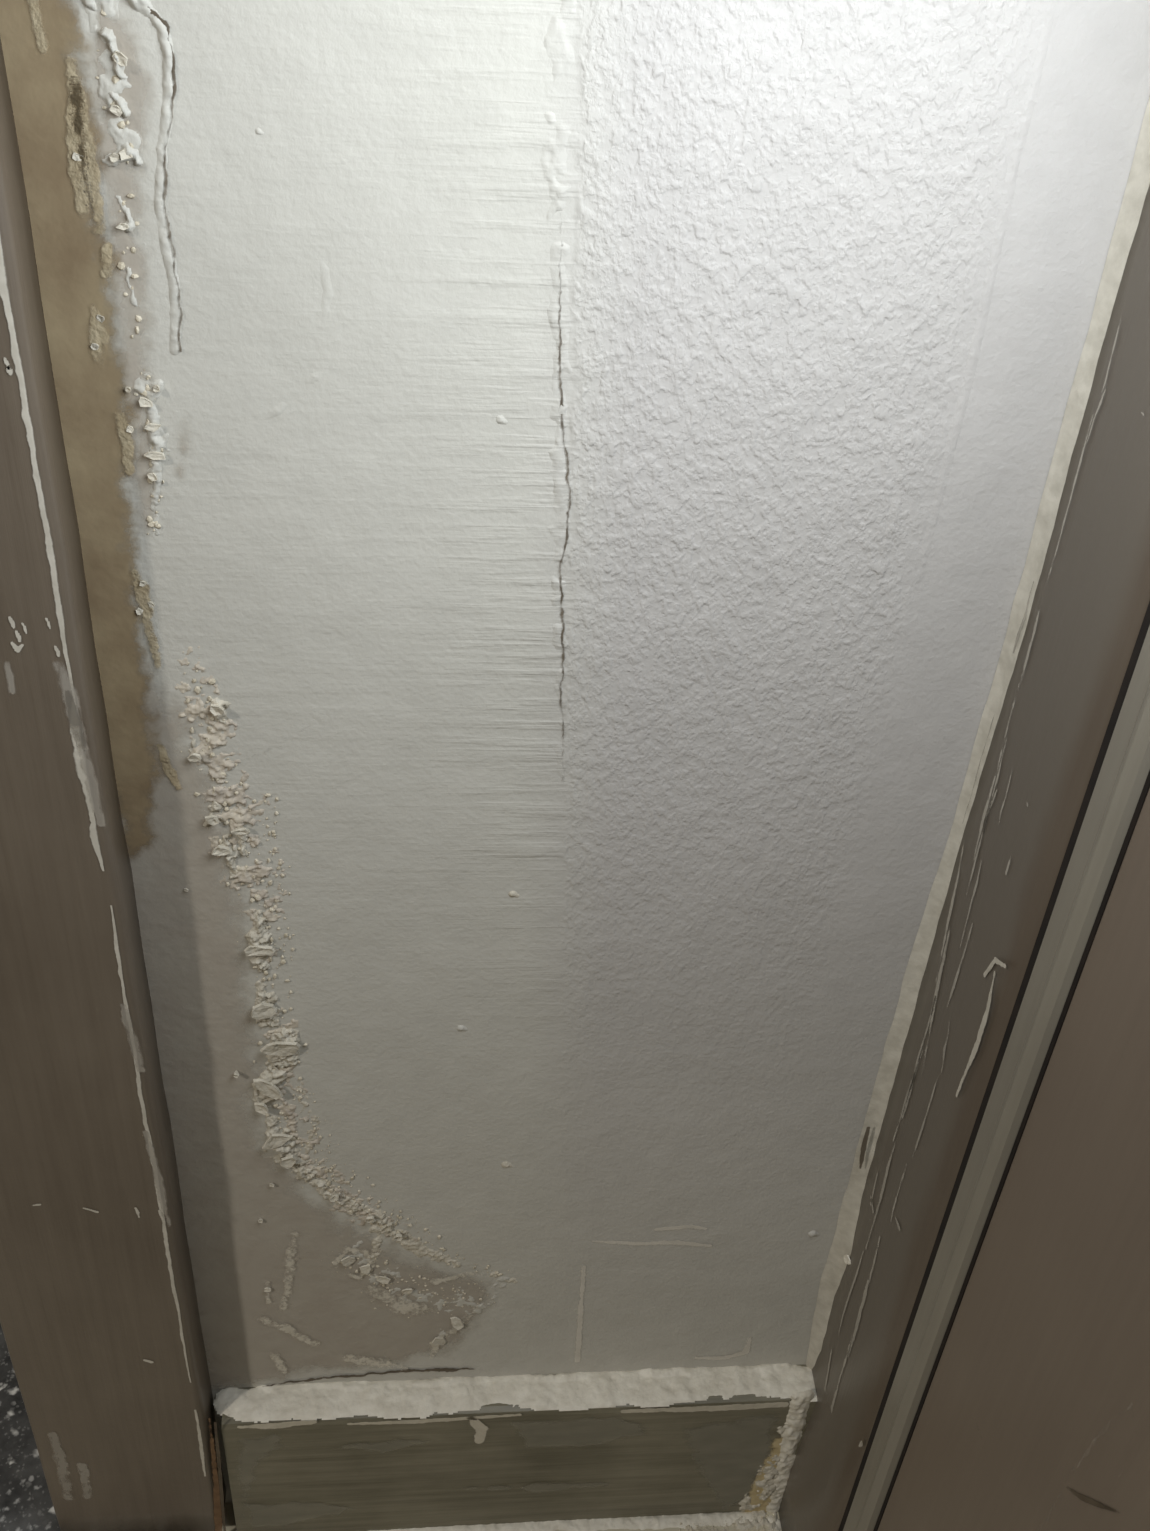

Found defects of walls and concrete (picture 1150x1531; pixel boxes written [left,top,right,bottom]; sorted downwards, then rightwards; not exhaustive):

peeling [0,238,128,871]
peeling [81,0,179,536]
peeling [110,646,518,1386]
peeling [194,1410,206,1476]